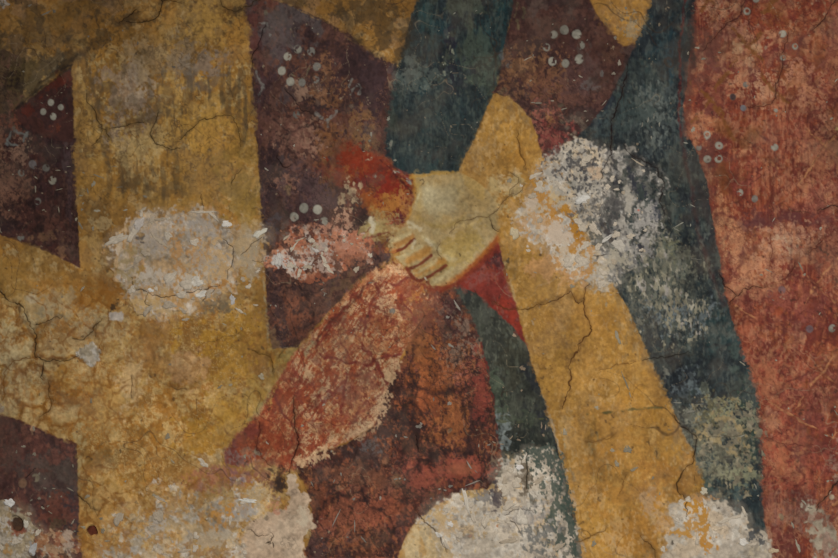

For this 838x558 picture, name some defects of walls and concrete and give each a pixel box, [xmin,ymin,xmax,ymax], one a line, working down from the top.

crack [119,0,183,23]
crack [86,93,241,150]
peeling [75,172,377,336]
peeling [506,132,713,358]
crack [0,291,103,417]
crack [493,283,593,409]
crack [600,351,691,370]
peeling [0,472,318,558]
peeling [413,422,596,558]
peeling [655,393,779,558]